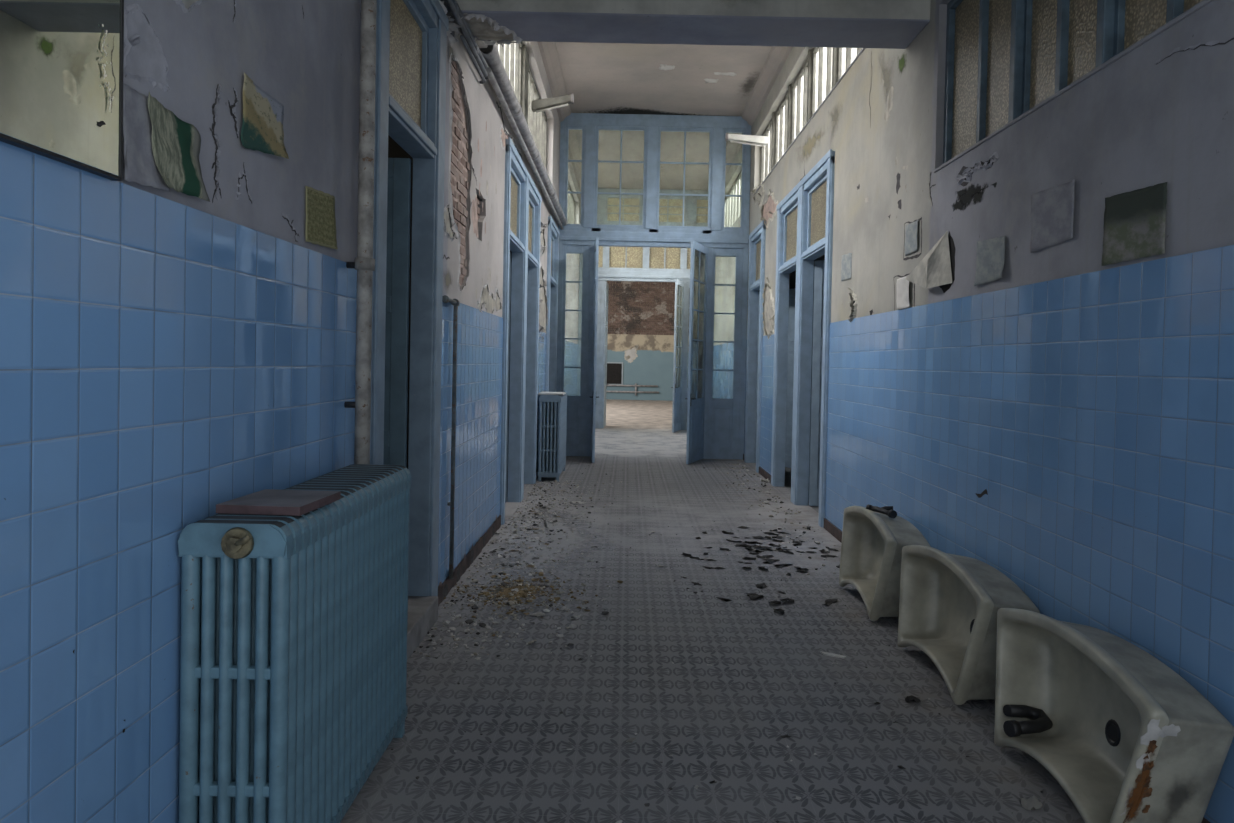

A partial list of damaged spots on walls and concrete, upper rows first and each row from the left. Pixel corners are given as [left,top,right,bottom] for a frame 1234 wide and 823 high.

peeling [103,3,170,100]
crack [1155,38,1234,65]
crack [210,85,253,203]
flaking render [439,0,523,292]
peeling [956,151,999,187]